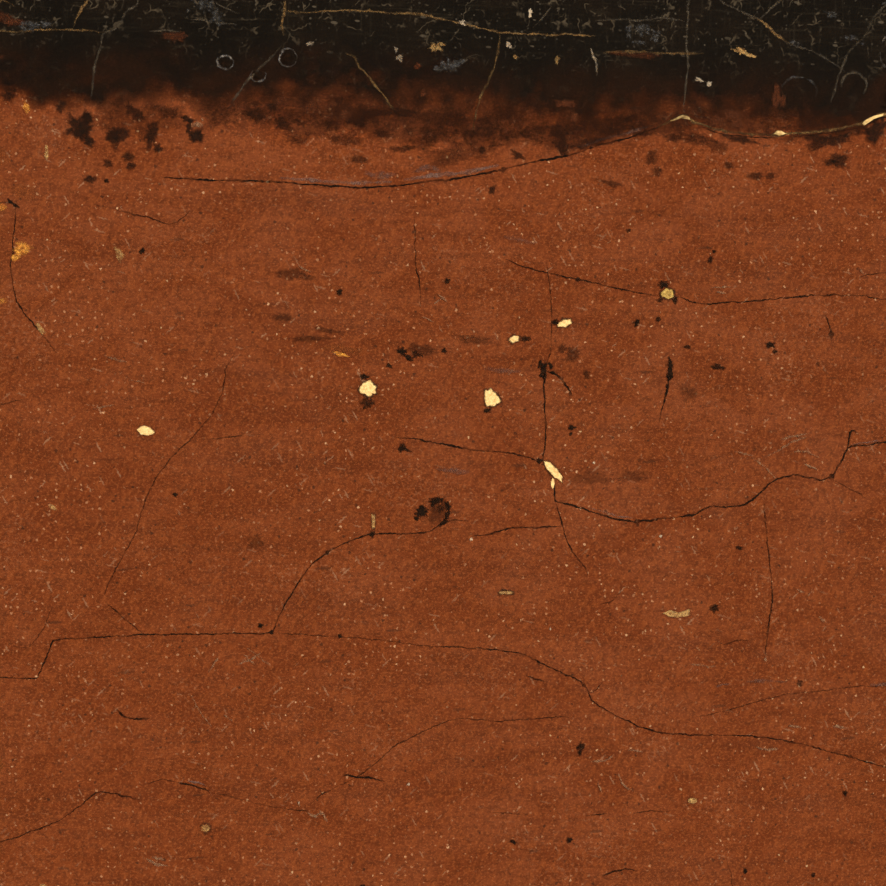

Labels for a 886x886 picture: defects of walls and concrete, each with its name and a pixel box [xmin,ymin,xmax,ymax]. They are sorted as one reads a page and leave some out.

crack [314,9,590,37]
damp [57,102,95,147]
damp [107,128,129,144]
damp [181,116,203,142]
damp [789,116,886,167]
crack [165,166,497,189]
peeling [358,374,378,409]
peeling [484,388,502,413]
peeling [137,426,155,435]
peeling [537,458,563,489]
crack [477,430,886,650]
crack [0,522,447,679]